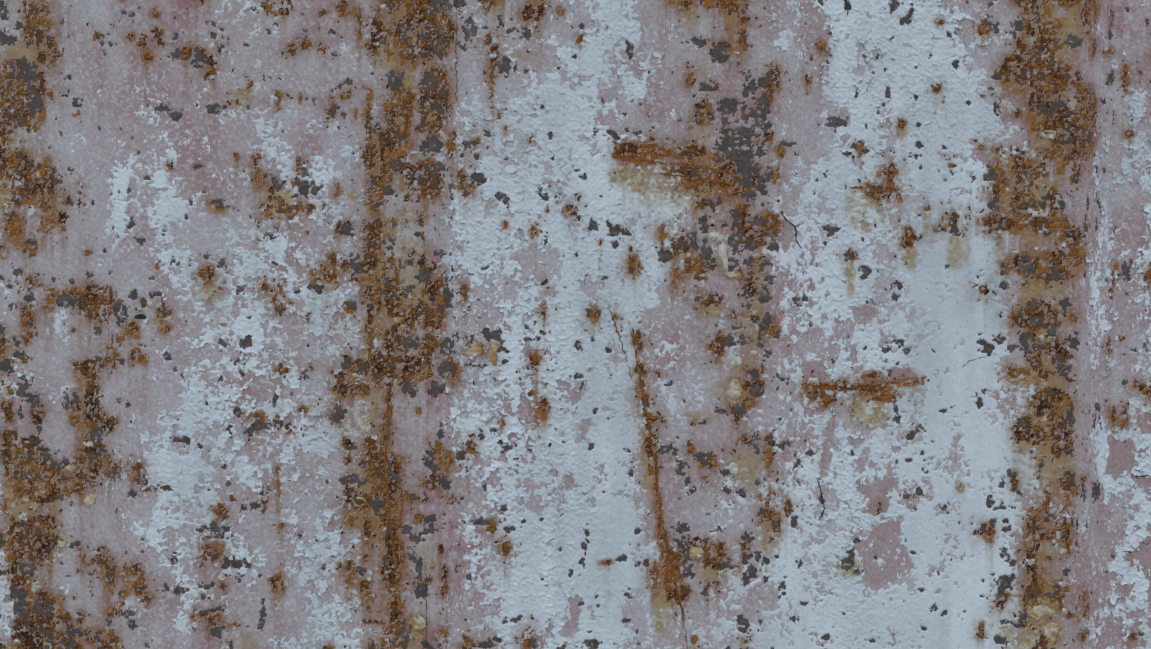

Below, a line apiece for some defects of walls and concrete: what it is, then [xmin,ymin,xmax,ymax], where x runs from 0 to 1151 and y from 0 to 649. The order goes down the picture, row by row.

corrosion [119,0,230,82]
peeling [458,127,495,199]
corrosion [189,190,239,213]
peeling [587,218,632,249]
corrosion [193,254,228,302]
peeling [458,328,510,373]
corrosion [603,100,930,618]
corrosion [845,0,1151,649]
peeling [225,393,299,441]
peeling [133,436,272,649]
corrosion [217,465,284,534]
peeling [792,406,927,649]